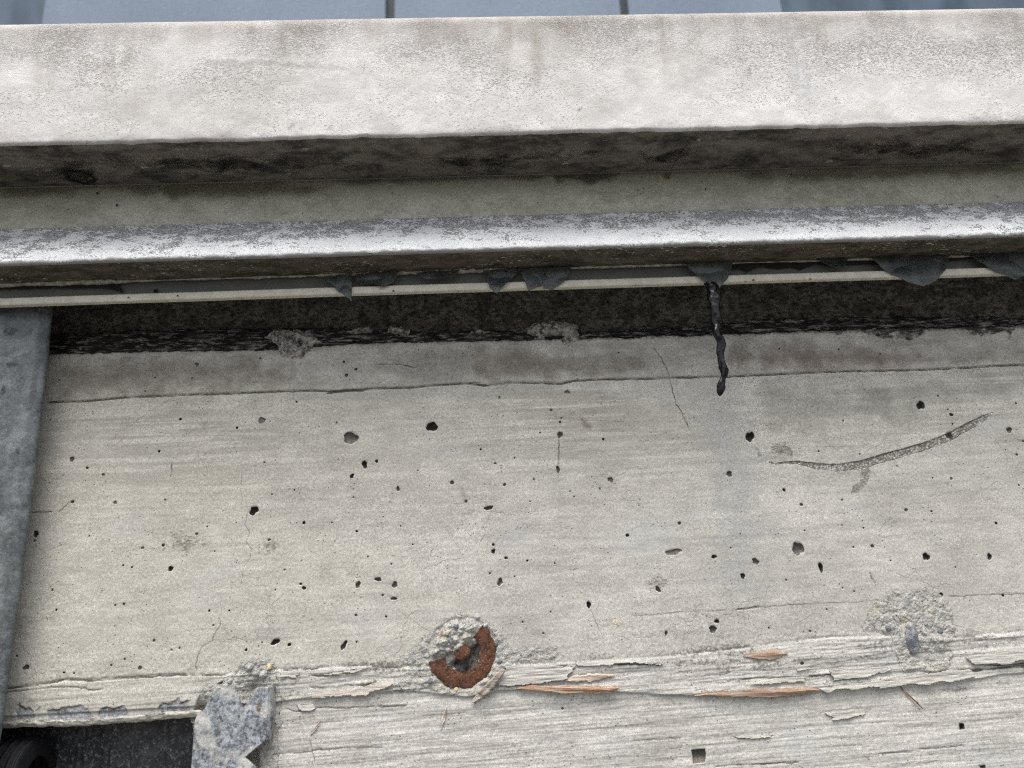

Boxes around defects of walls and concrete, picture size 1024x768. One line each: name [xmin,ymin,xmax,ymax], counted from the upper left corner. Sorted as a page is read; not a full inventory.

crack [48,364,488,403]
crack [522,356,1024,425]
spalling [296,612,663,711]
spalling [750,588,1024,693]
peeling [15,703,127,723]
spalling [158,658,300,768]
peeling [825,711,865,721]